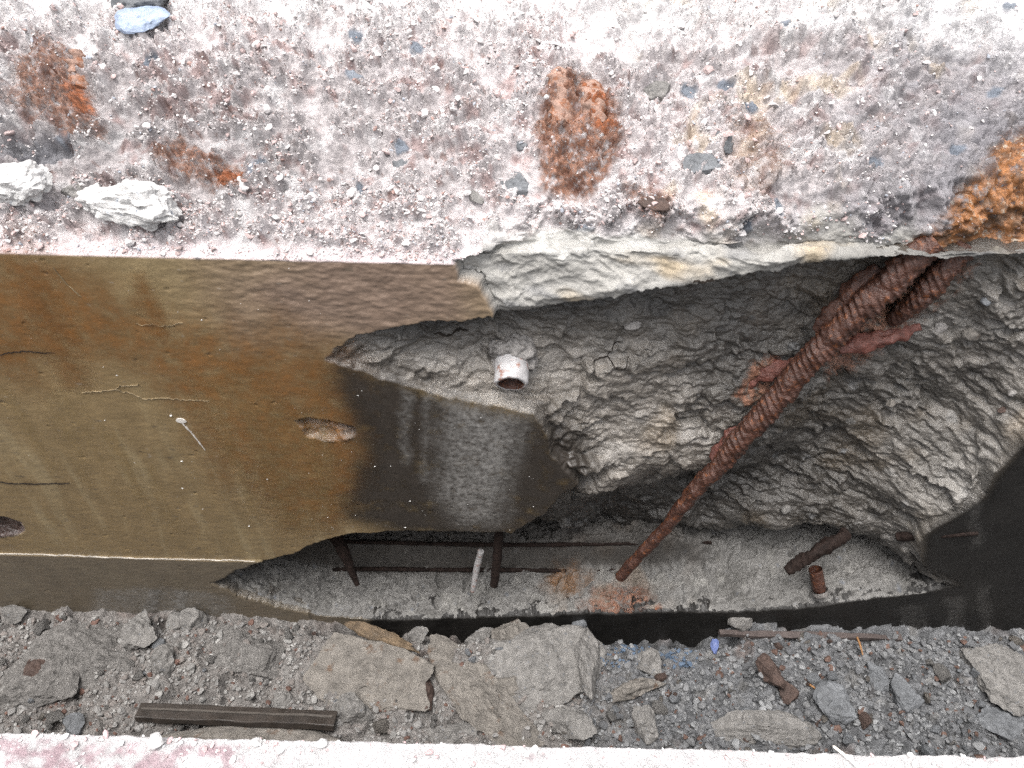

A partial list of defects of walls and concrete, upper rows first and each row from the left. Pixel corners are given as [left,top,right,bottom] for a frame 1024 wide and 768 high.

rust [15,41,103,134]
rust [153,141,242,185]
rust [535,67,621,200]
rust [930,136,1024,248]
damp [338,367,590,534]
spalling [212,206,1024,620]
rust [734,355,780,406]
rust [592,588,656,614]